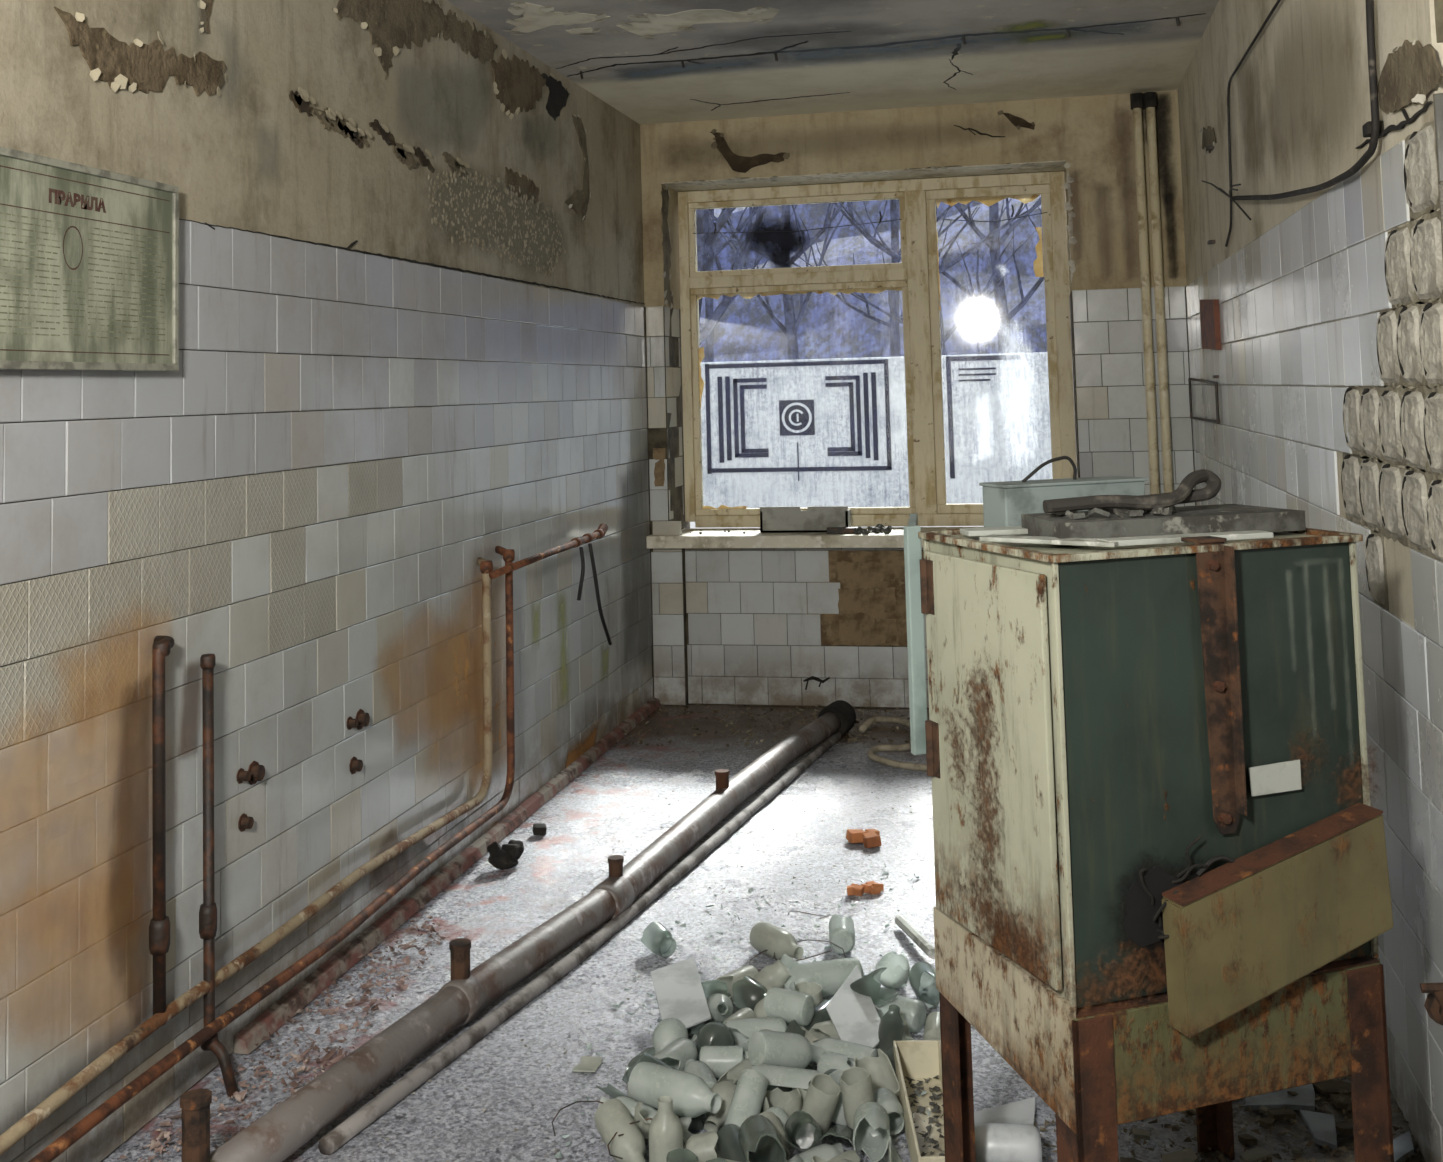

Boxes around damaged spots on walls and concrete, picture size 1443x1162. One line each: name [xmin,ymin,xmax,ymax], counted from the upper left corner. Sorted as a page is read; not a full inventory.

peeling [54,7,227,97]
peeling [197,0,213,34]
spalling [289,87,470,181]
peeling [333,0,790,220]
crack [690,92,850,111]
crack [555,13,1206,90]
crack [954,125,1005,137]
spalling [1377,40,1443,113]
leakage [1143,95,1177,277]
spalling [661,185,673,309]
peeling [1341,120,1443,611]
peeling [807,550,907,646]